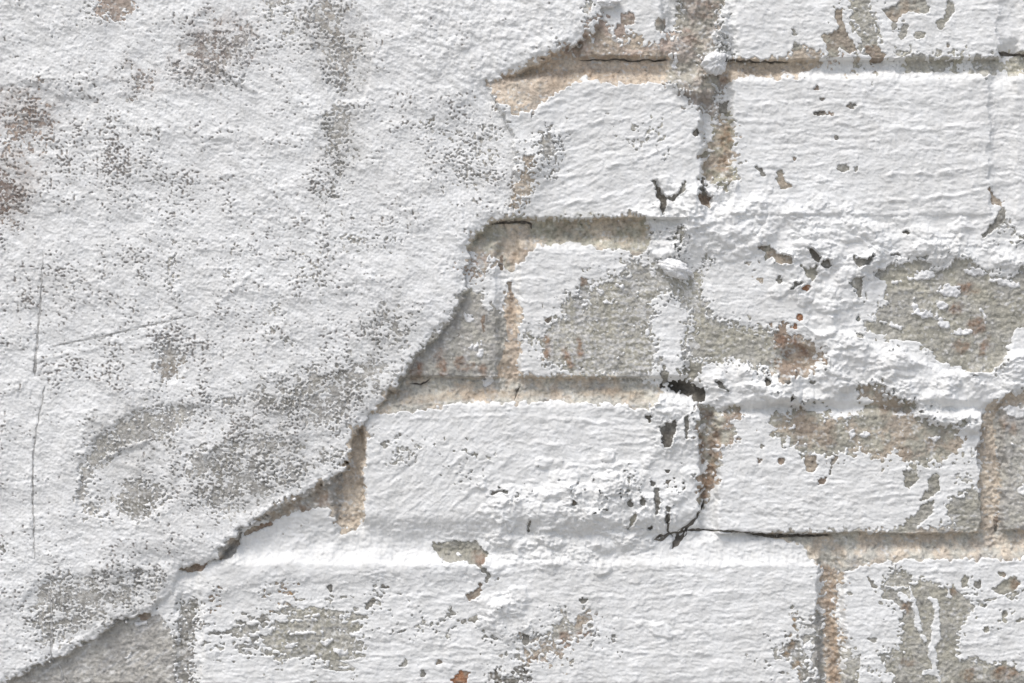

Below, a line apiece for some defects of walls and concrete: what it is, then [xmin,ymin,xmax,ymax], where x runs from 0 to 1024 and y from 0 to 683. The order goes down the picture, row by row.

spalling [555,0,741,161]
peeling [401,113,572,217]
peeling [73,227,1024,573]
crack [654,500,828,549]
flaking render [2,550,623,683]
peeling [838,563,1024,683]